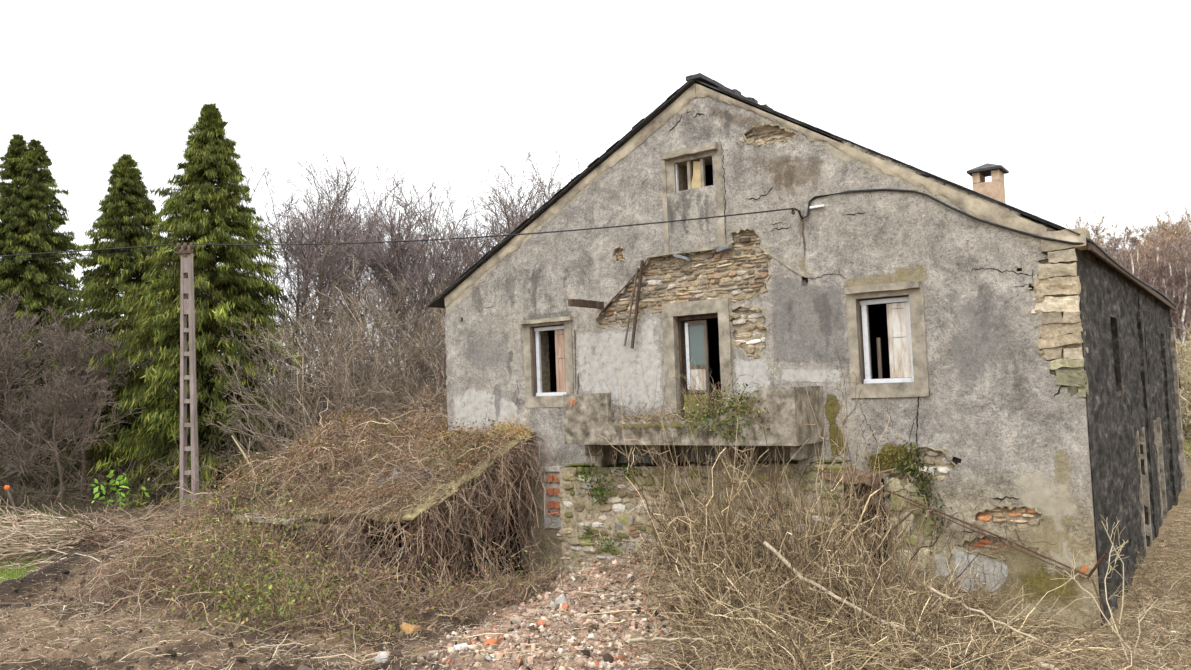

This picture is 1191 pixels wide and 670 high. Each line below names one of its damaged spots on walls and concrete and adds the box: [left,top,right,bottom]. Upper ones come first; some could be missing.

flaking render [739,122,796,146]
peeling [577,227,841,413]
peeling [883,447,1079,592]
leakage [992,450,1080,608]